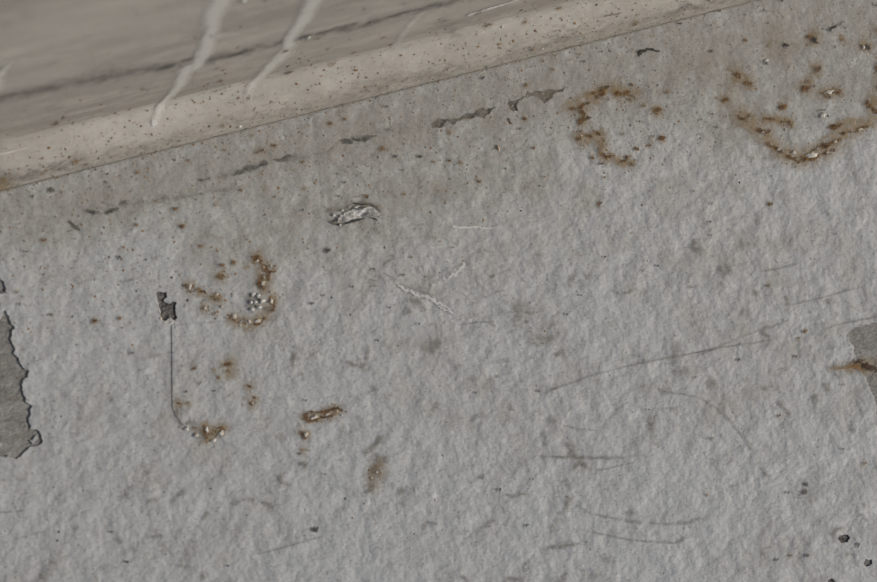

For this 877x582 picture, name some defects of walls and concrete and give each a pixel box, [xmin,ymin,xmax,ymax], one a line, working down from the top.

water stain [152,0,230,121]
water stain [246,0,322,96]
corrosion [568,79,666,166]
corrosion [711,61,877,169]
corrosion [172,255,281,329]
peeling [0,311,43,459]
corrosion [838,356,877,373]
peeling [846,323,877,414]
corrosion [184,422,229,447]
corrosion [296,403,348,460]